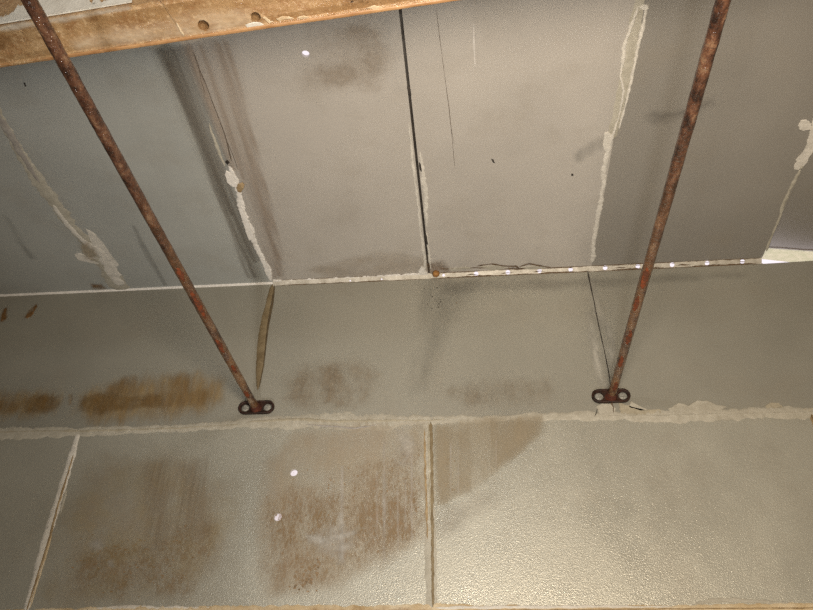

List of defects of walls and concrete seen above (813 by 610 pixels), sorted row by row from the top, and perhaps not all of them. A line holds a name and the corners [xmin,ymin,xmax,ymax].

peeling [0,4,31,30]
peeling [38,0,132,21]
peeling [798,119,811,131]